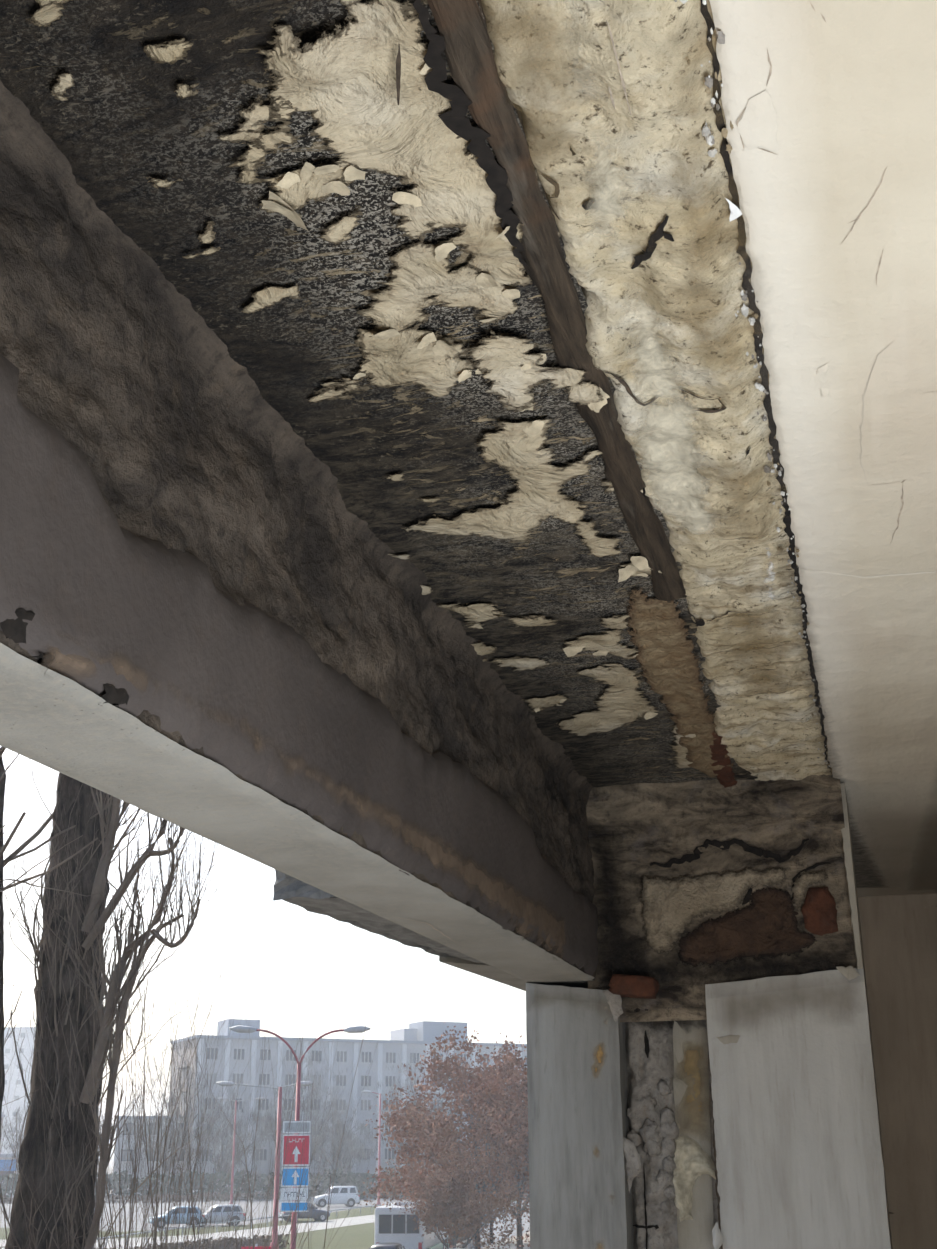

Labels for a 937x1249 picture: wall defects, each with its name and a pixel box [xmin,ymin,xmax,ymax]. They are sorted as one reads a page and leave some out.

peeling [27,0,73,27]
peeling [143,38,197,64]
peeling [50,68,75,105]
damp [590,150,622,234]
peeling [726,199,742,221]
peeling [183,220,220,259]
peeling [217,0,737,788]
crack [701,0,937,774]
crack [687,607,758,622]
crack [650,838,831,899]
crack [643,1030,651,1058]
crack [633,1167,657,1249]